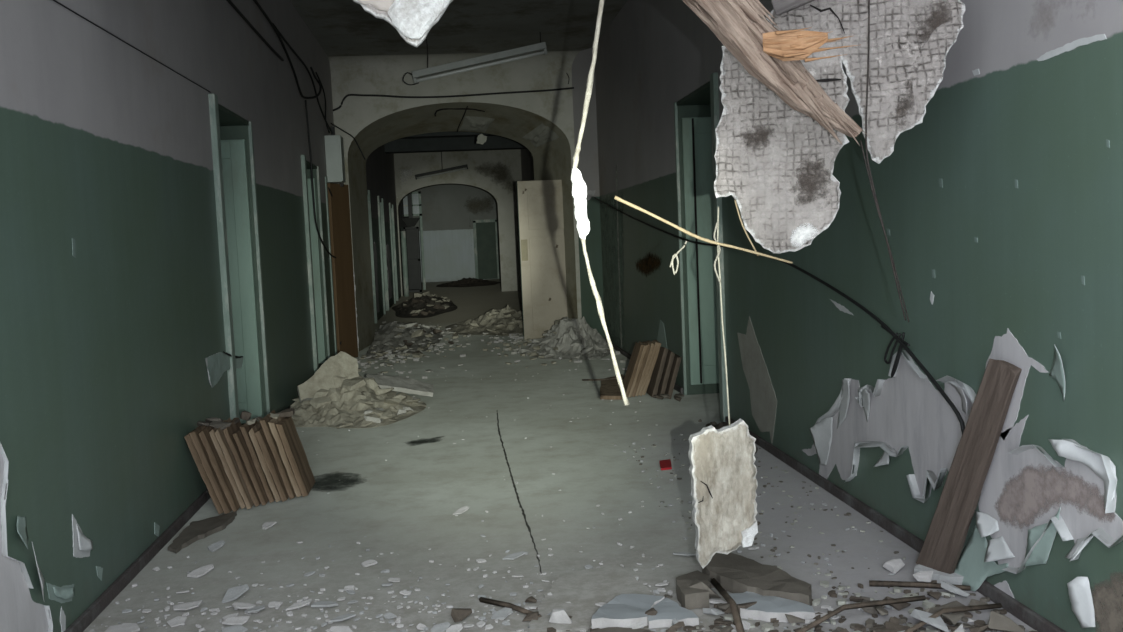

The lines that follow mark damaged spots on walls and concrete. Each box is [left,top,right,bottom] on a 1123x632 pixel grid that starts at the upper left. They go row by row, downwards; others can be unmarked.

peeling [459,116,494,145]
peeling [373,242,392,312]
peeling [0,442,75,632]
peeling [72,514,103,581]
crack [496,411,542,574]
peeling [802,350,976,503]
peeling [954,328,1123,599]
peeling [1067,576,1123,632]